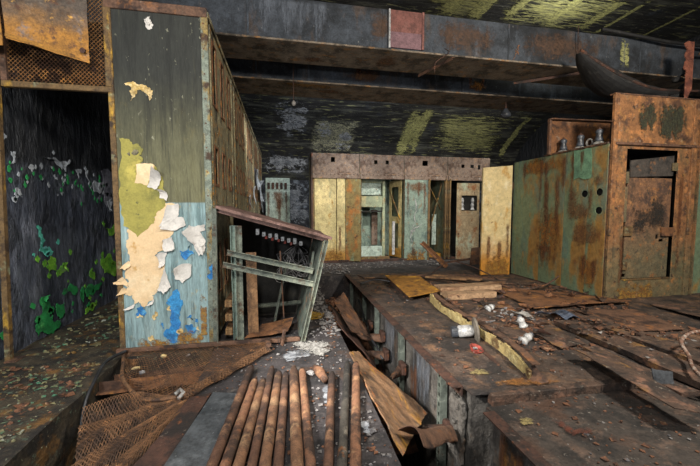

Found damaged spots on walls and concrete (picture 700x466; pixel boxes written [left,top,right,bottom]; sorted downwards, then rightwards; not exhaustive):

peeling [124,81,153,100]
efflorescence [276,102,308,136]
water stain [312,121,358,152]
water stain [396,110,433,155]
water stain [430,114,521,156]
corrosion [524,157,602,266]
peeling [7,138,206,356]
peeling [0,362,99,449]